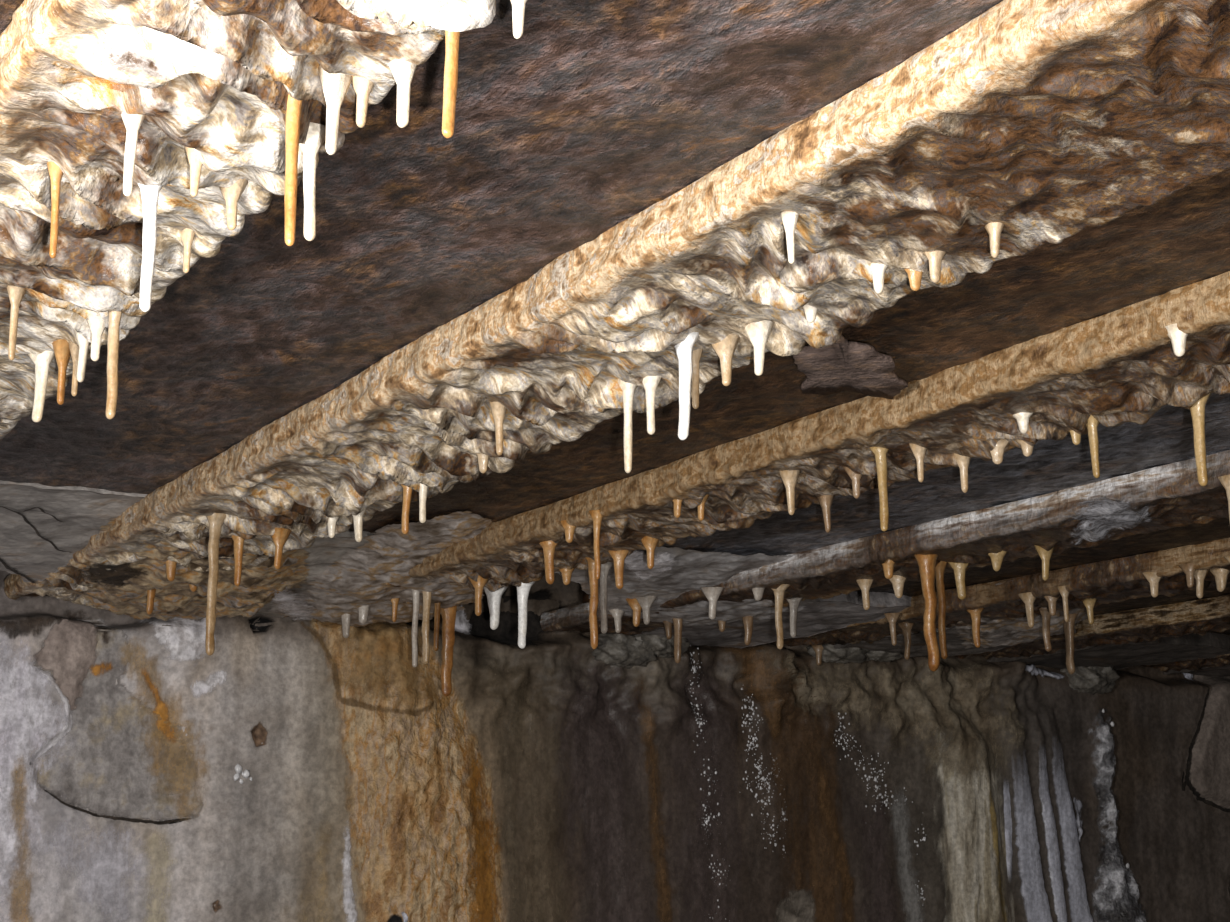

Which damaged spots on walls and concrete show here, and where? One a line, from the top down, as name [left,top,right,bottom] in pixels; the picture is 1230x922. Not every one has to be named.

water stain [0,0,1230,643]
crack [0,559,35,583]
crack [0,506,69,552]
spalling [469,589,562,646]
water stain [488,664,652,922]
water stain [540,450,1230,922]